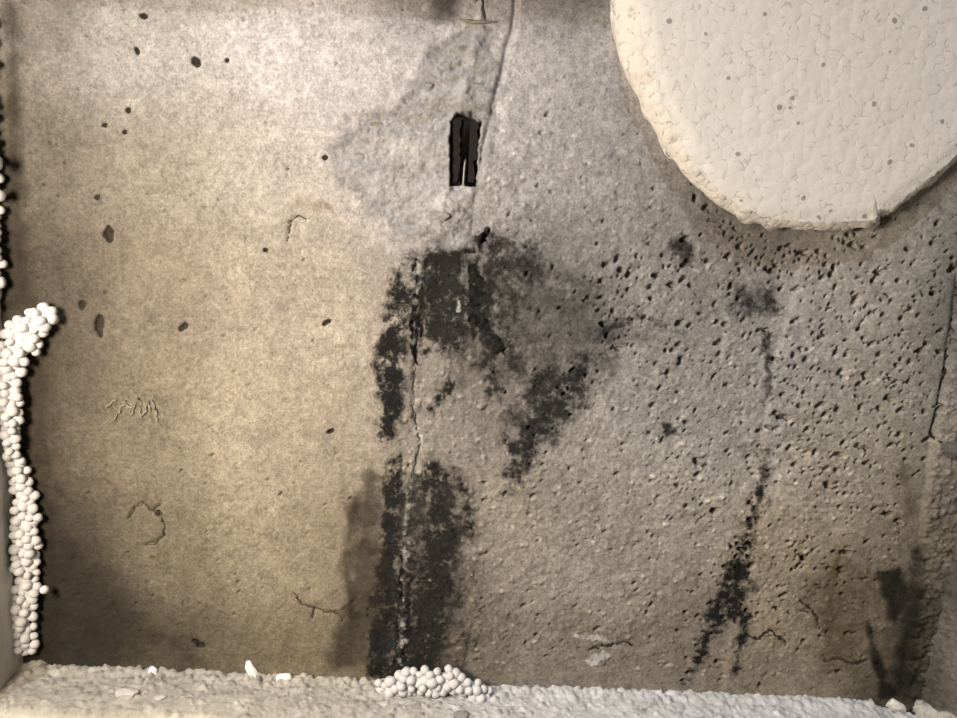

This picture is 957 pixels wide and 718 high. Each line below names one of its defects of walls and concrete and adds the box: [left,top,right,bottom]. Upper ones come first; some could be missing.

spalling [322,19,507,248]
crack [407,264,426,489]
damp [370,233,638,480]
crack [928,286,957,443]
damp [336,454,473,679]
damp [680,449,776,683]
damp [866,548,924,698]
peeling [912,700,957,718]